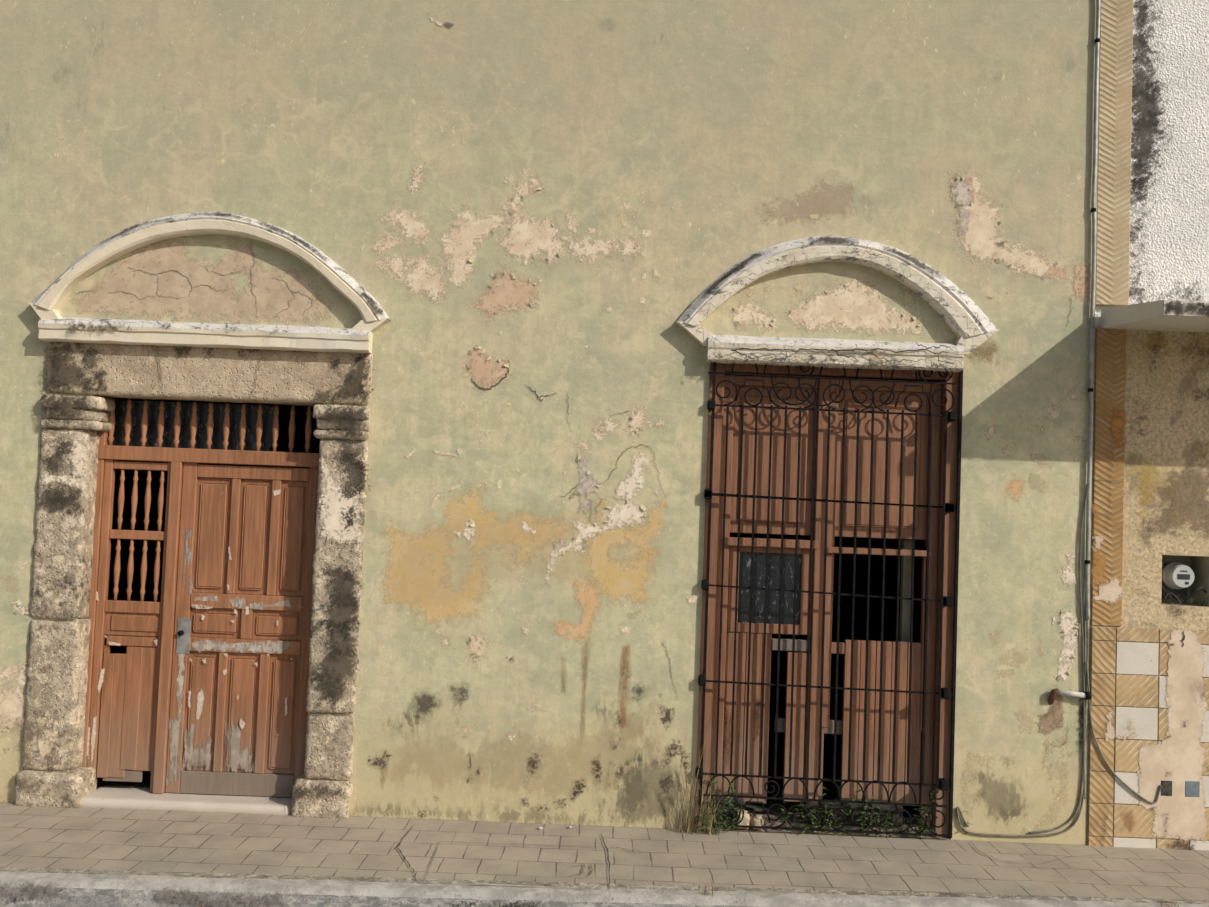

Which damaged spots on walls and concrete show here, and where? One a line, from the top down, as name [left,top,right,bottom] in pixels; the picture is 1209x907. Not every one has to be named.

damp [1129,0,1174,304]
crack [73,242,313,321]
peeling [373,163,651,335]
peeling [730,278,924,338]
peeling [949,170,1092,301]
damp [39,319,131,420]
damp [39,438,85,518]
peeling [531,406,667,585]
damp [1141,465,1209,544]
peeling [1093,577,1125,603]
damp [414,694,437,713]
peeling [1038,596,1080,734]